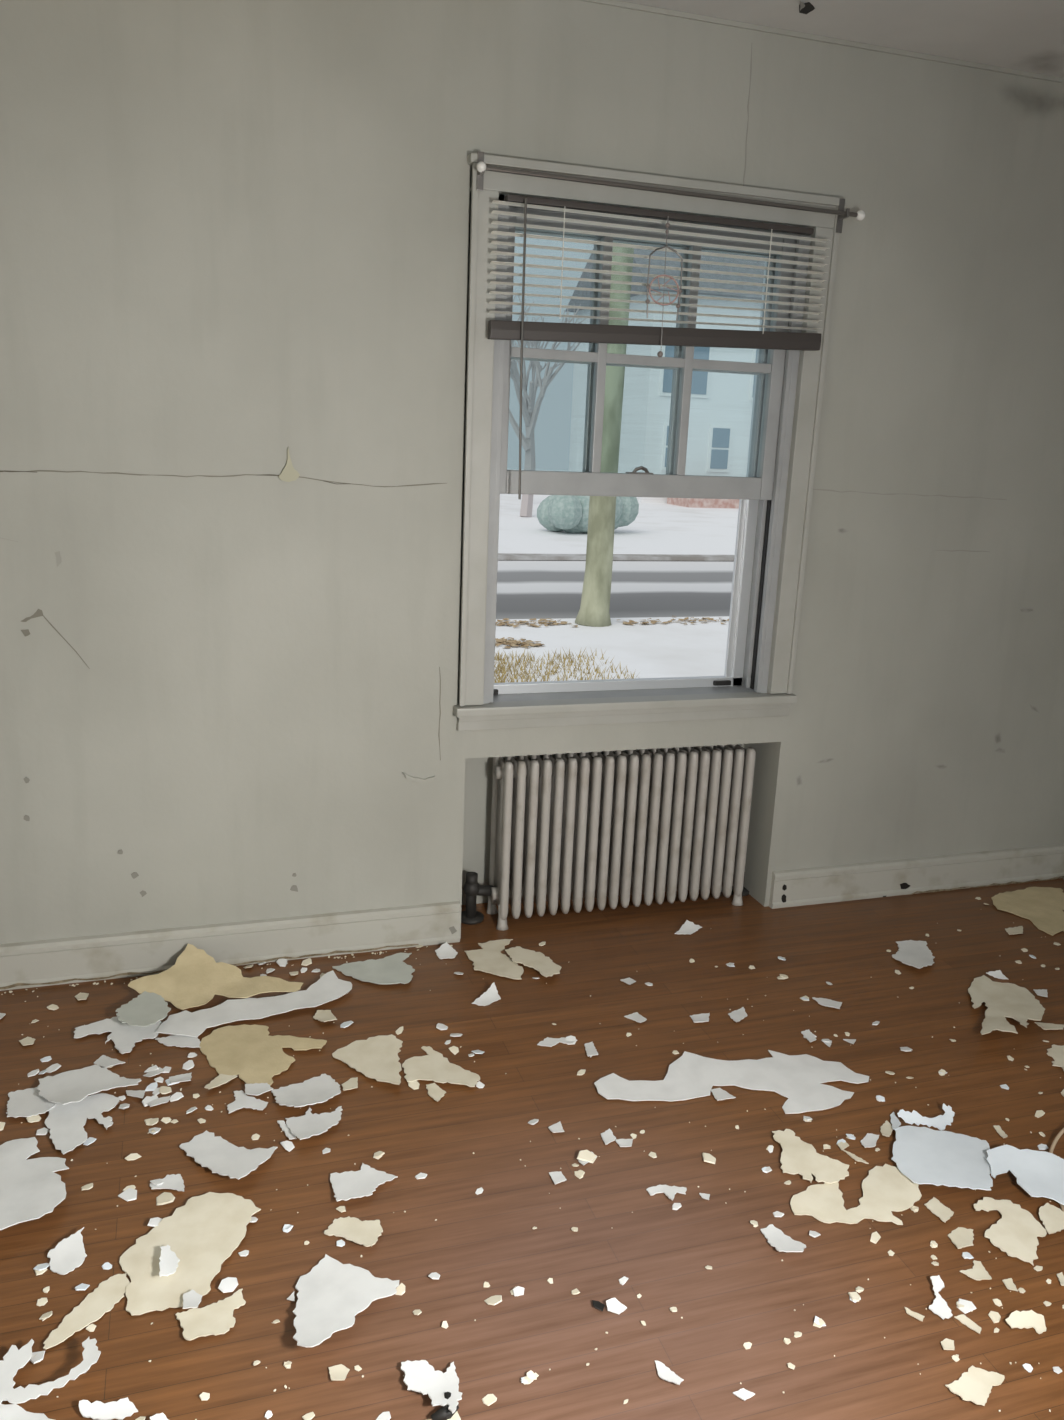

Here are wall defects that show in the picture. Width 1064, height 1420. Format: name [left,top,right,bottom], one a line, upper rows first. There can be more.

crack [0,447,445,487]